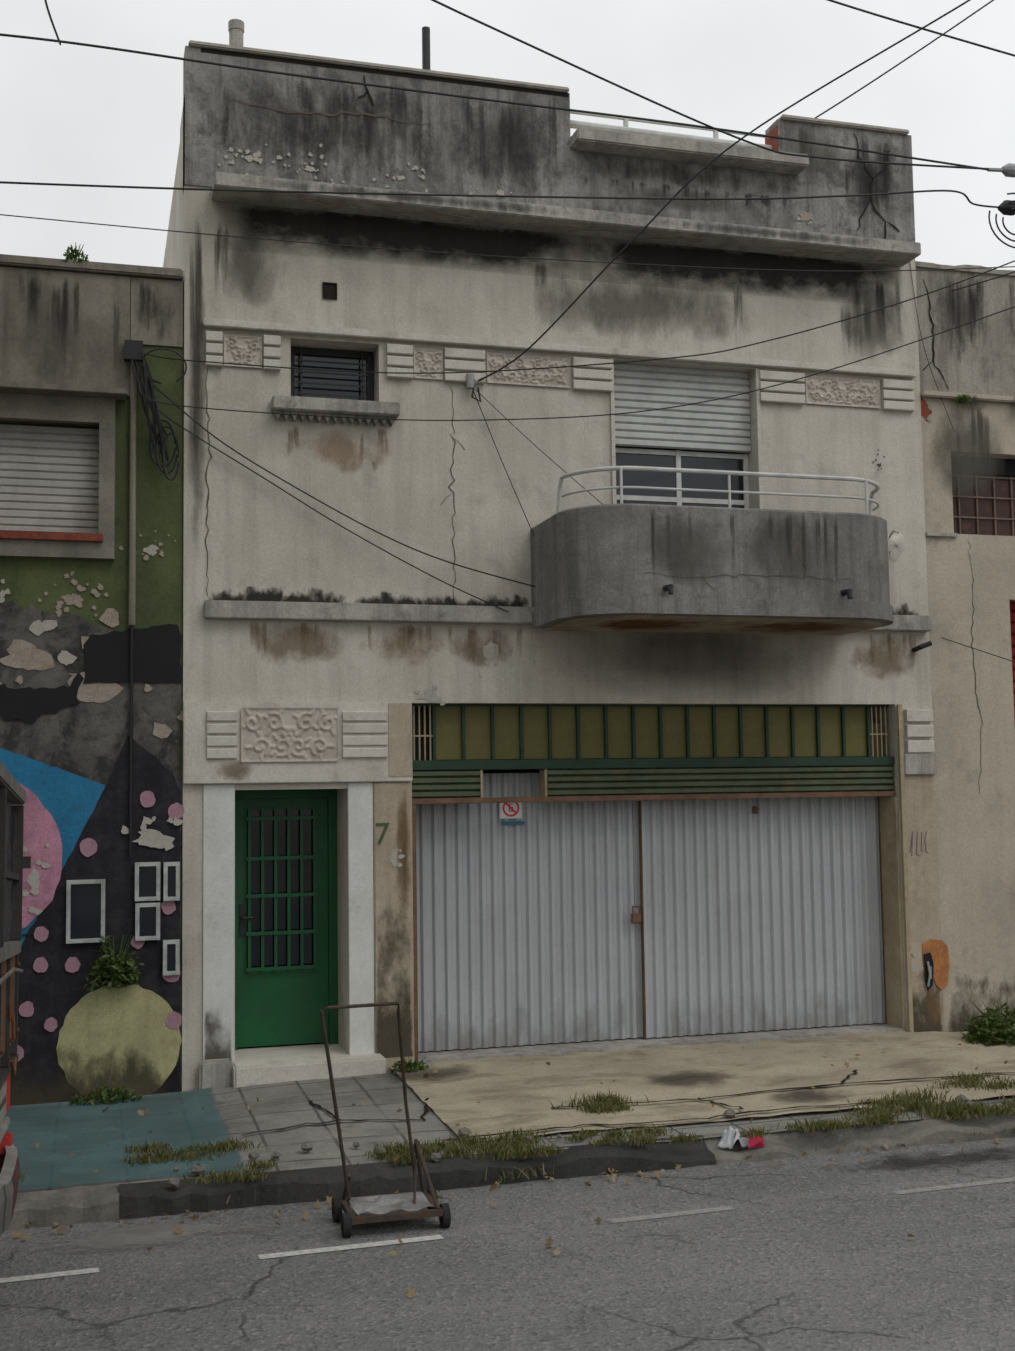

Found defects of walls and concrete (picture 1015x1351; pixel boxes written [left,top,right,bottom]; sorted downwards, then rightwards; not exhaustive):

peeling [217,144,345,184]
crack [853,133,900,239]
damp [561,242,893,344]
crack [441,387,465,598]
rust [602,620,697,629]
rust [754,623,835,632]
flaking render [0,571,183,851]